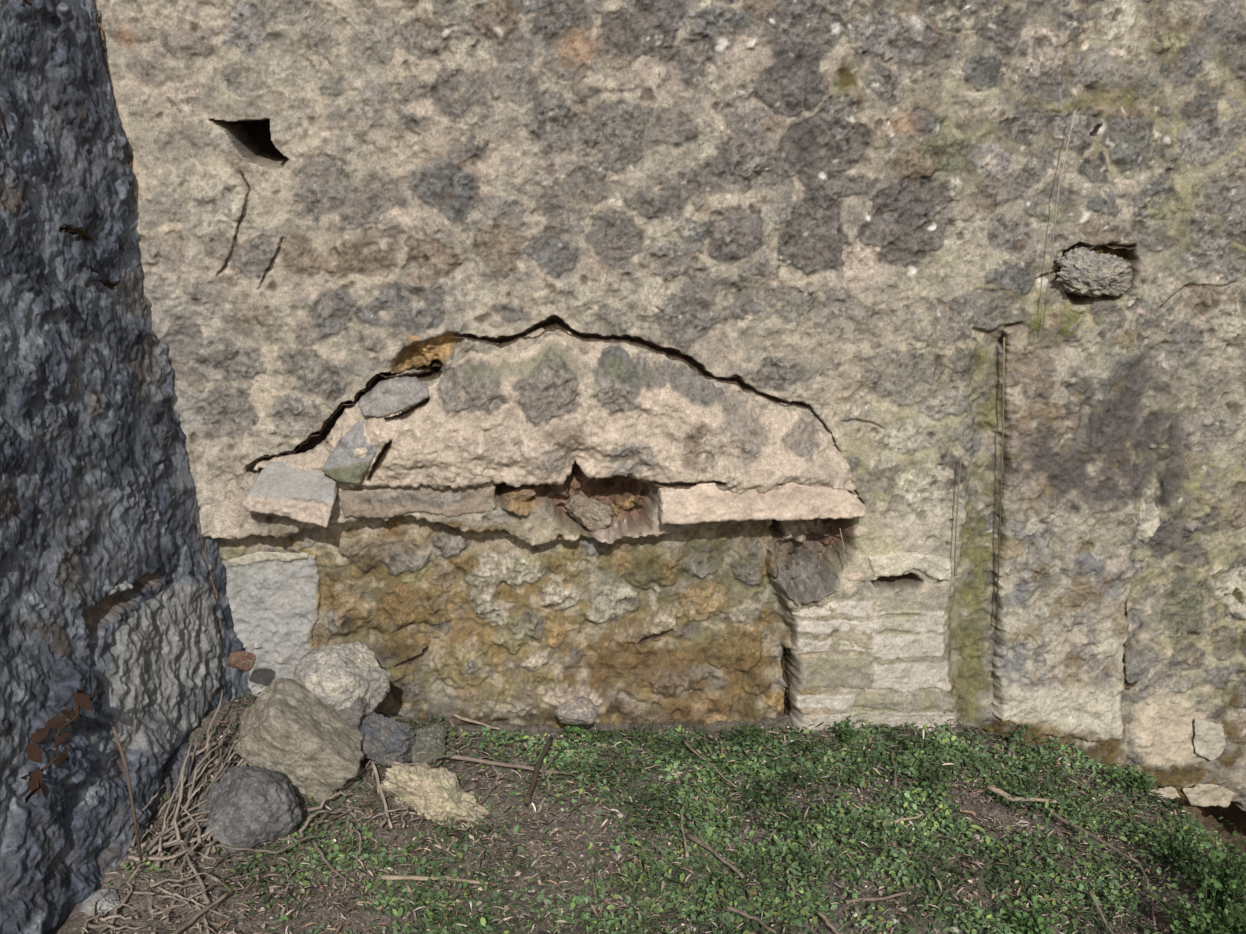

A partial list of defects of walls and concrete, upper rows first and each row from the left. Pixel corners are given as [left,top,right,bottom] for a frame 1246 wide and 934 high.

crack [215,172,250,277]
crack [257,239,282,289]
spalling [1057,241,1143,313]
crack [248,363,442,475]
crack [454,315,884,450]
spalling [488,460,658,544]
spalling [763,518,925,606]
peeling [222,552,321,696]
crack [1122,600,1138,690]